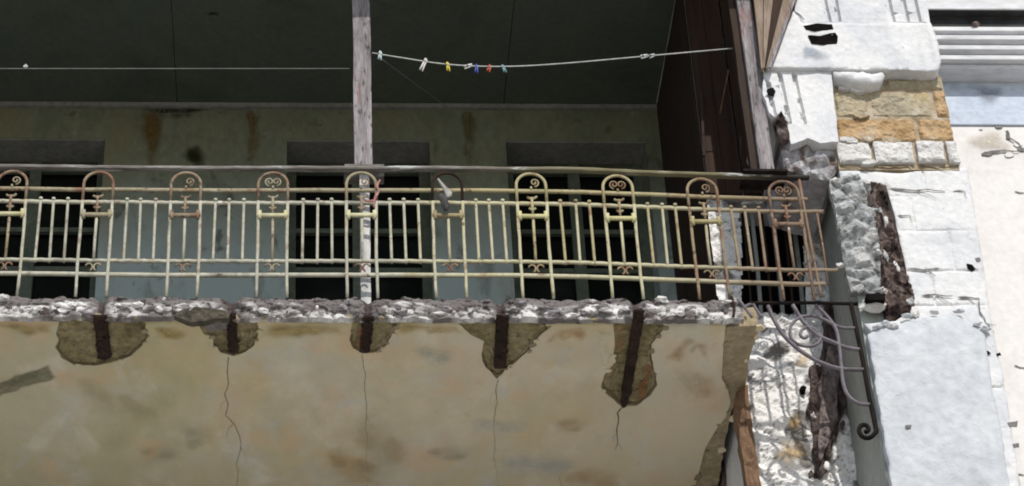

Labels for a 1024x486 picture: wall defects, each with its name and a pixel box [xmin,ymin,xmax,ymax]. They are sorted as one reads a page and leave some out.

flaking render [763,77,961,322]
crack [220,357,247,486]
spalling [0,294,765,486]
crack [613,407,623,451]
spalling [799,305,847,480]